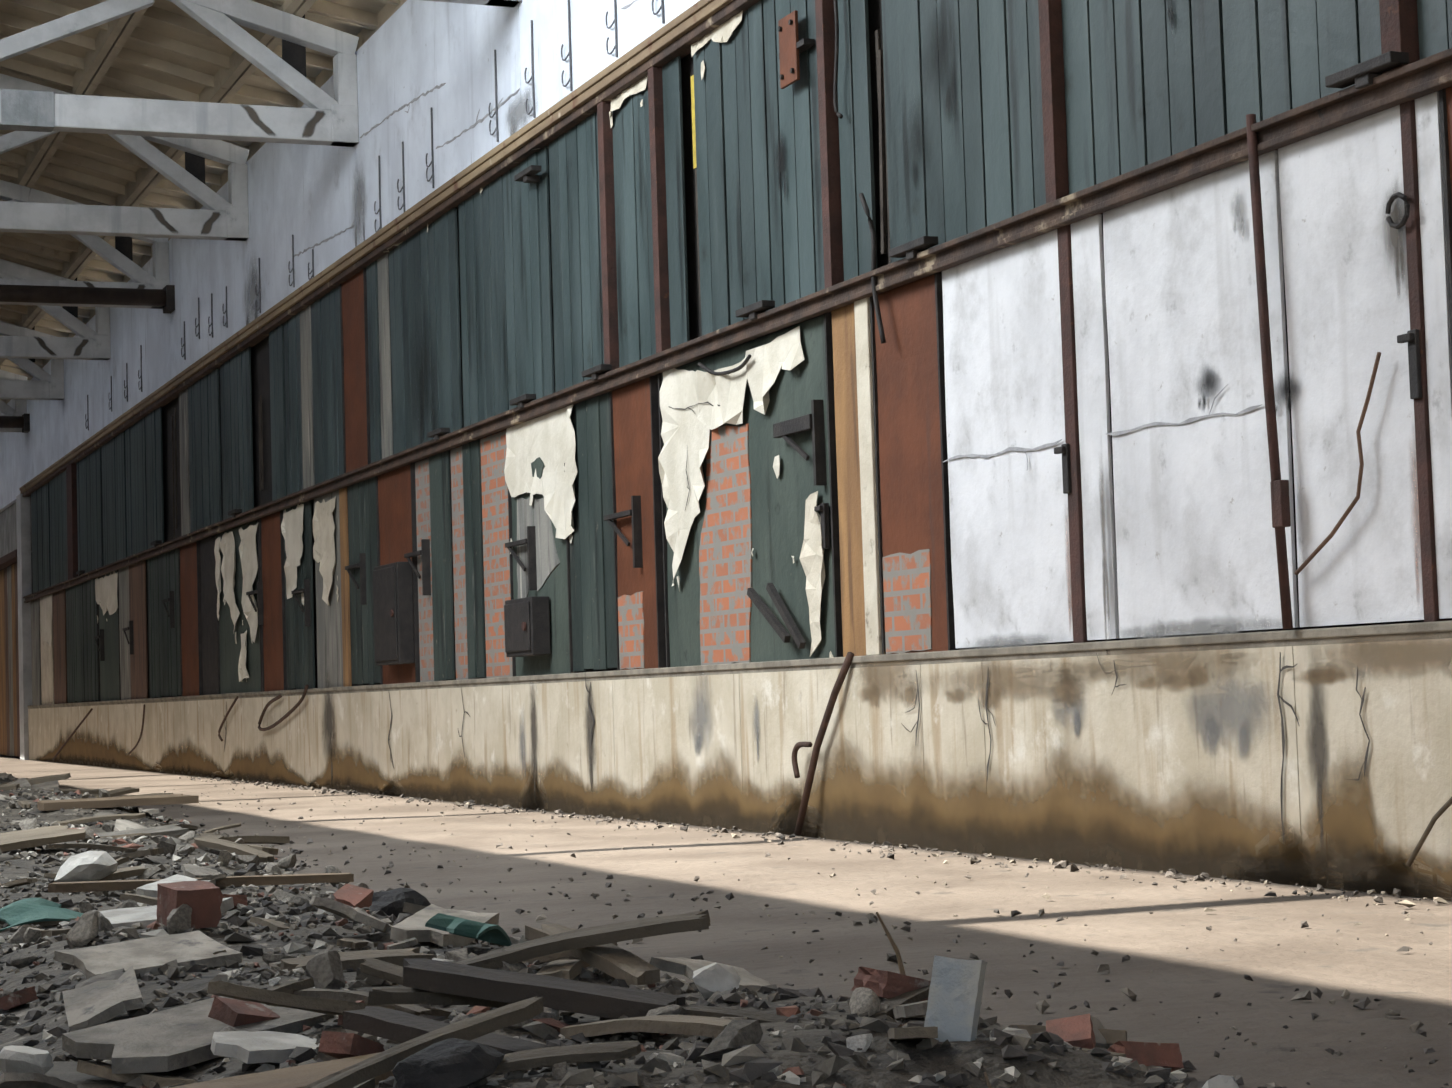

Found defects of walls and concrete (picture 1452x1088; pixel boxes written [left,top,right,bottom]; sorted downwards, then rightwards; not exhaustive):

peeling [504,405,578,544]
peeling [658,326,805,665]
crack [943,439,1062,470]
crack [1106,384,1263,436]
damp [1198,371,1215,408]
peeling [214,523,258,682]
peeling [281,496,339,606]
peeling [791,491,833,658]
damp [983,636,1039,648]
damp [1146,620,1241,639]
damp [37,682,1452,901]